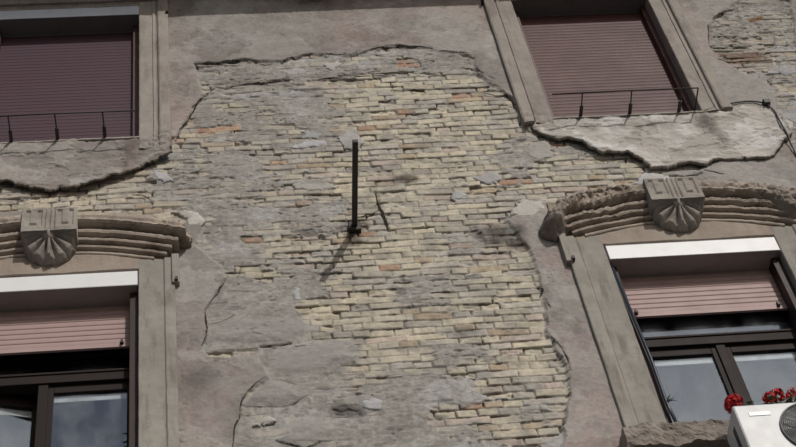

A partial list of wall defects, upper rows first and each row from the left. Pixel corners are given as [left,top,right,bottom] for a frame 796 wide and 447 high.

crack [178,53,334,135]
crack [312,75,419,92]
crack [357,44,516,105]
spalling [0,136,198,219]
crack [358,192,389,232]
spalling [171,0,796,447]
crack [201,263,242,346]
crack [231,378,307,447]